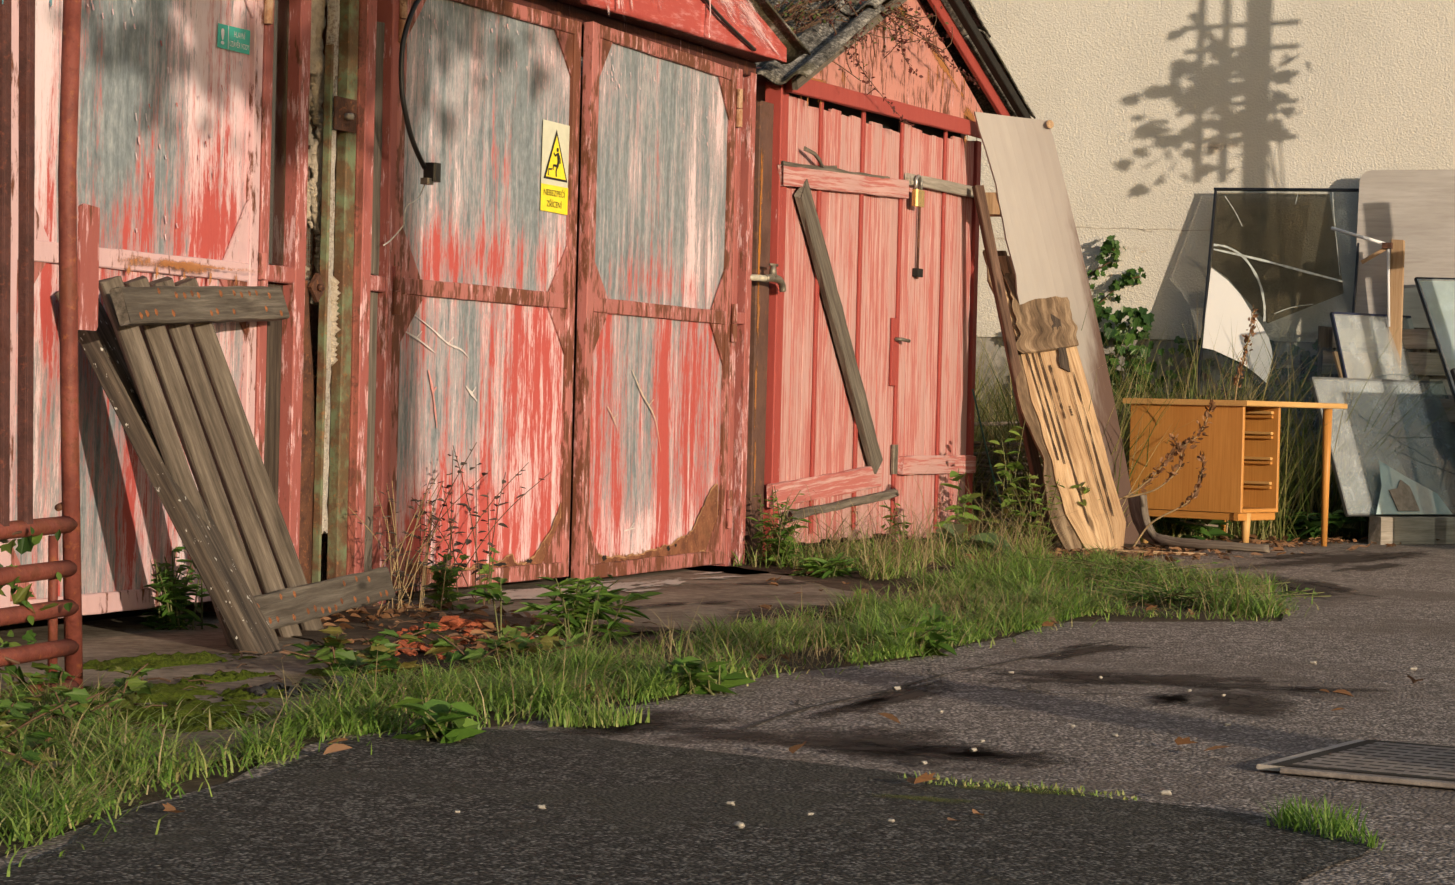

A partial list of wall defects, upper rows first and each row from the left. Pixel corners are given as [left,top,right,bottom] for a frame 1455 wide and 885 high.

peeling [709,0,778,54]